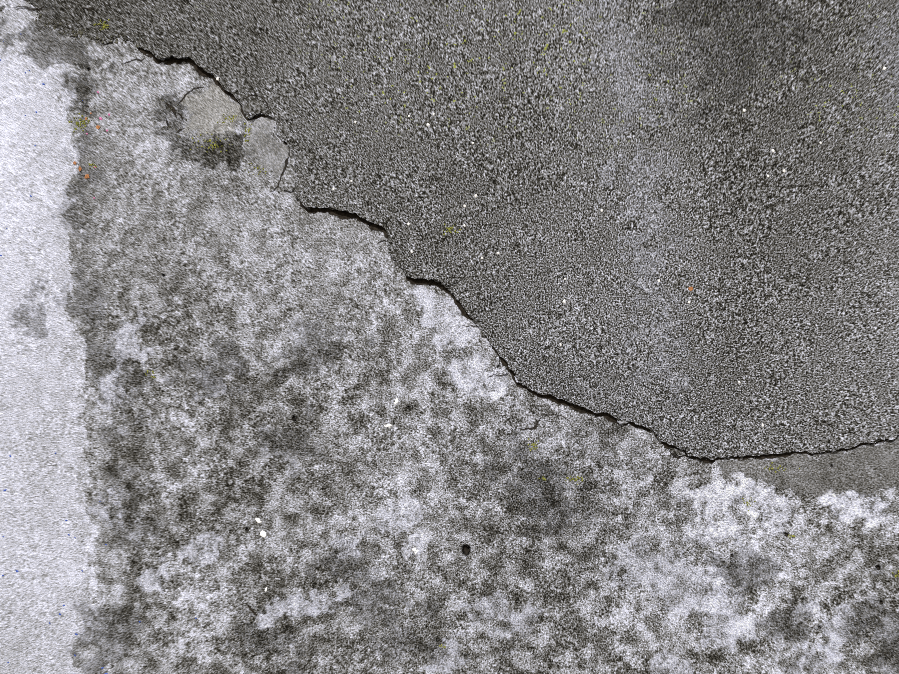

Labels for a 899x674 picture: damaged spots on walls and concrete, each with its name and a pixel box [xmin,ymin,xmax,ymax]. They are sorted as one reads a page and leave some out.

crack [122,48,269,133]
mould [156,91,257,172]
crack [270,141,389,243]
peeling [26,0,899,460]
water stain [573,0,690,404]
water stain [97,310,153,410]
water stain [411,285,513,401]
crack [405,275,899,464]
water stain [179,532,223,567]
water stain [605,438,899,651]
water stain [226,586,356,674]
water stain [460,592,543,639]